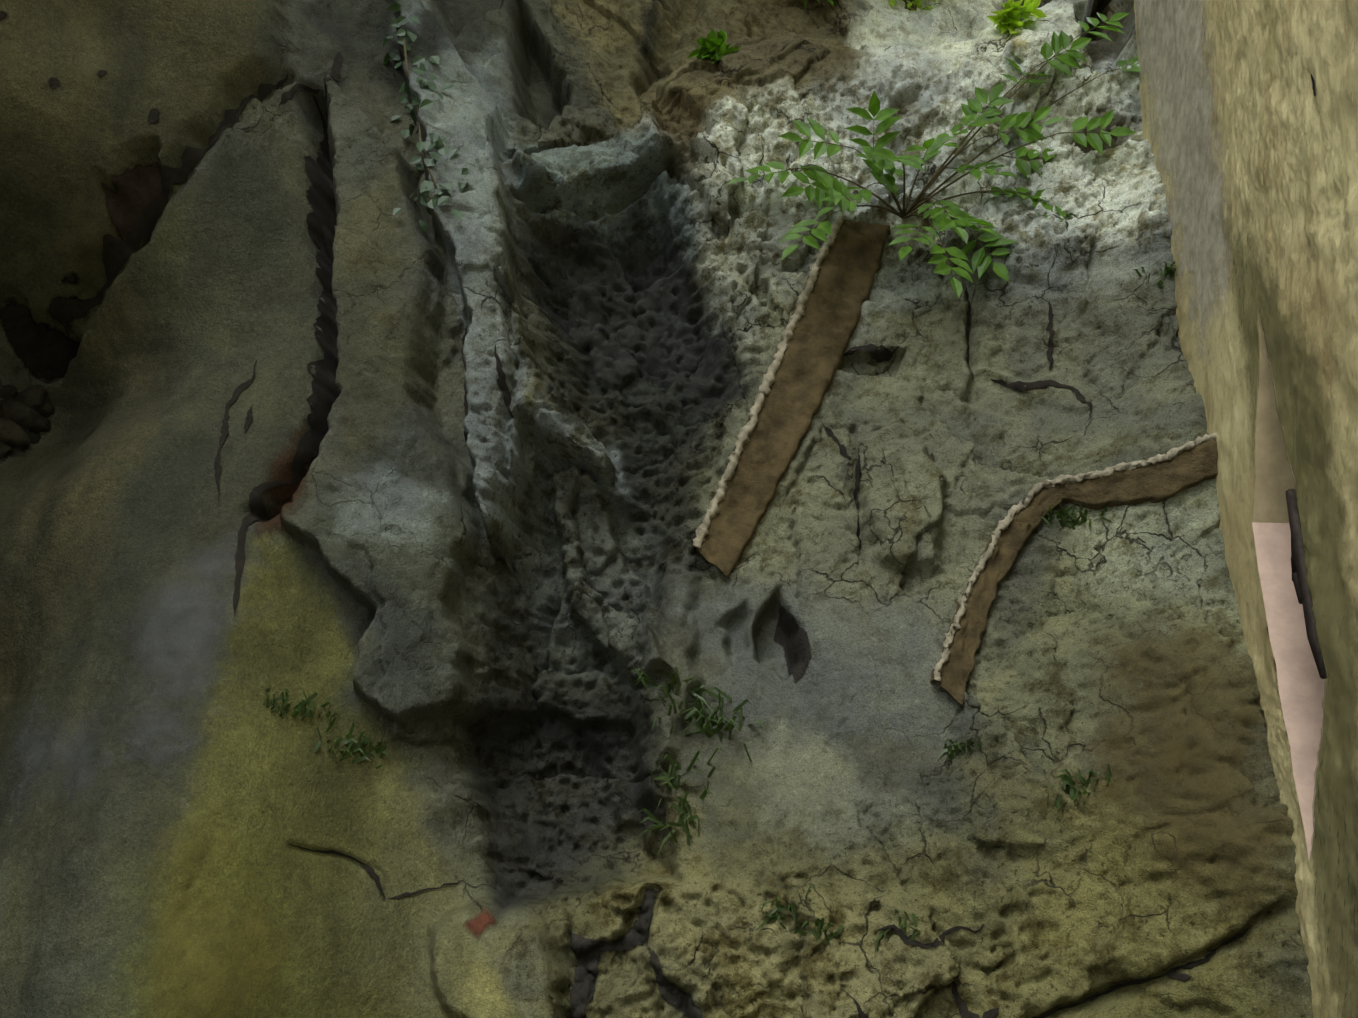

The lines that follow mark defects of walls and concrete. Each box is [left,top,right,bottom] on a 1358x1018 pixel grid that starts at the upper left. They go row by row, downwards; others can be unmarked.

spalling [0,297,80,382]
crack [60,51,342,616]
crack [288,844,464,899]
spalling [560,889,703,1018]
crack [878,924,984,948]
crack [952,982,999,1018]
crack [1033,907,1285,1018]